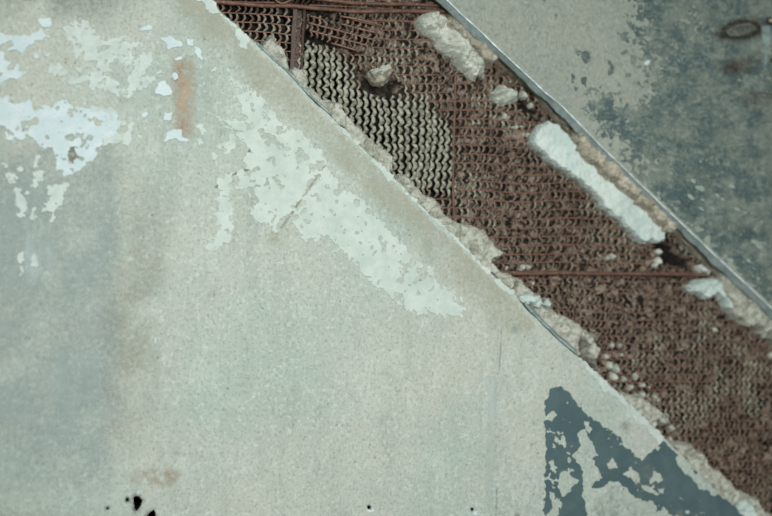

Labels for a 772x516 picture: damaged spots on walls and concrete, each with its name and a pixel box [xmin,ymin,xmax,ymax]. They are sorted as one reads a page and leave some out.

rust [720,20,761,39]
damp [762,26,770,65]
peeling [0,18,178,222]
peeling [17,250,38,276]
spalling [160,0,772,516]